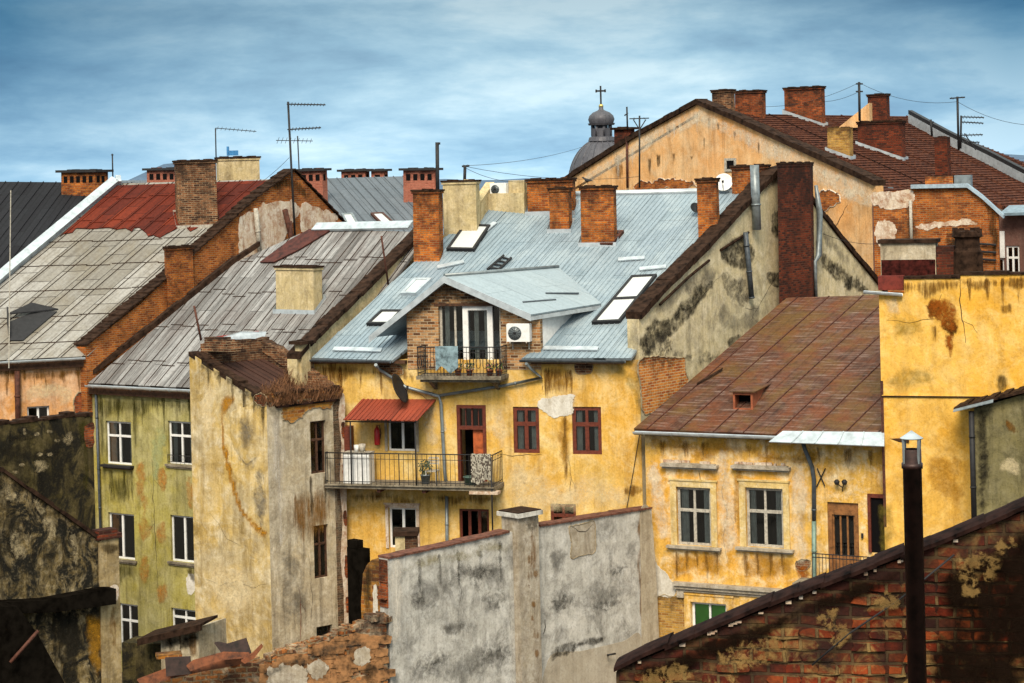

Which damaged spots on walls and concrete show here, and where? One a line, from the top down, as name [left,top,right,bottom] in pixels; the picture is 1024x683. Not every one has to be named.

flaking render [238,199,338,260]
leakage [721,238,754,268]
flaking render [819,189,841,212]
leakage [640,273,712,355]
leakage [905,278,1023,352]
leakage [222,389,245,412]
flaking render [637,355,689,415]
leakage [222,432,266,534]
spalling [253,385,349,623]
leakage [553,637,603,658]